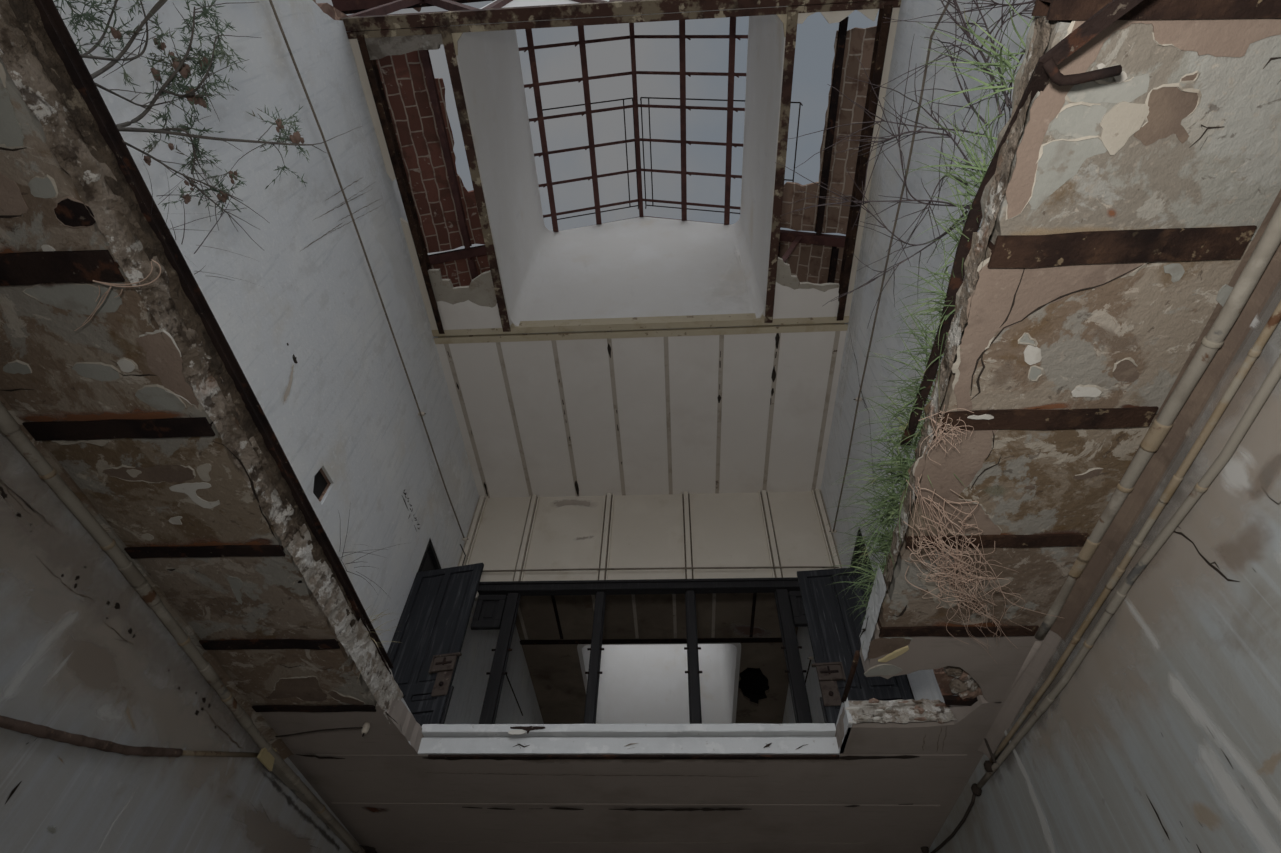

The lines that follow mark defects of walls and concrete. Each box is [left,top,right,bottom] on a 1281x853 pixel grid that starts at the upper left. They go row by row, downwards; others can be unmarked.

peeling [1005,18,1281,220]
spalling [0,173,96,229]
peeling [22,283,122,315]
rust [20,408,181,422]
peeling [72,329,199,412]
peeling [913,257,1185,535]
crack [970,262,1152,400]
peeling [169,463,220,509]